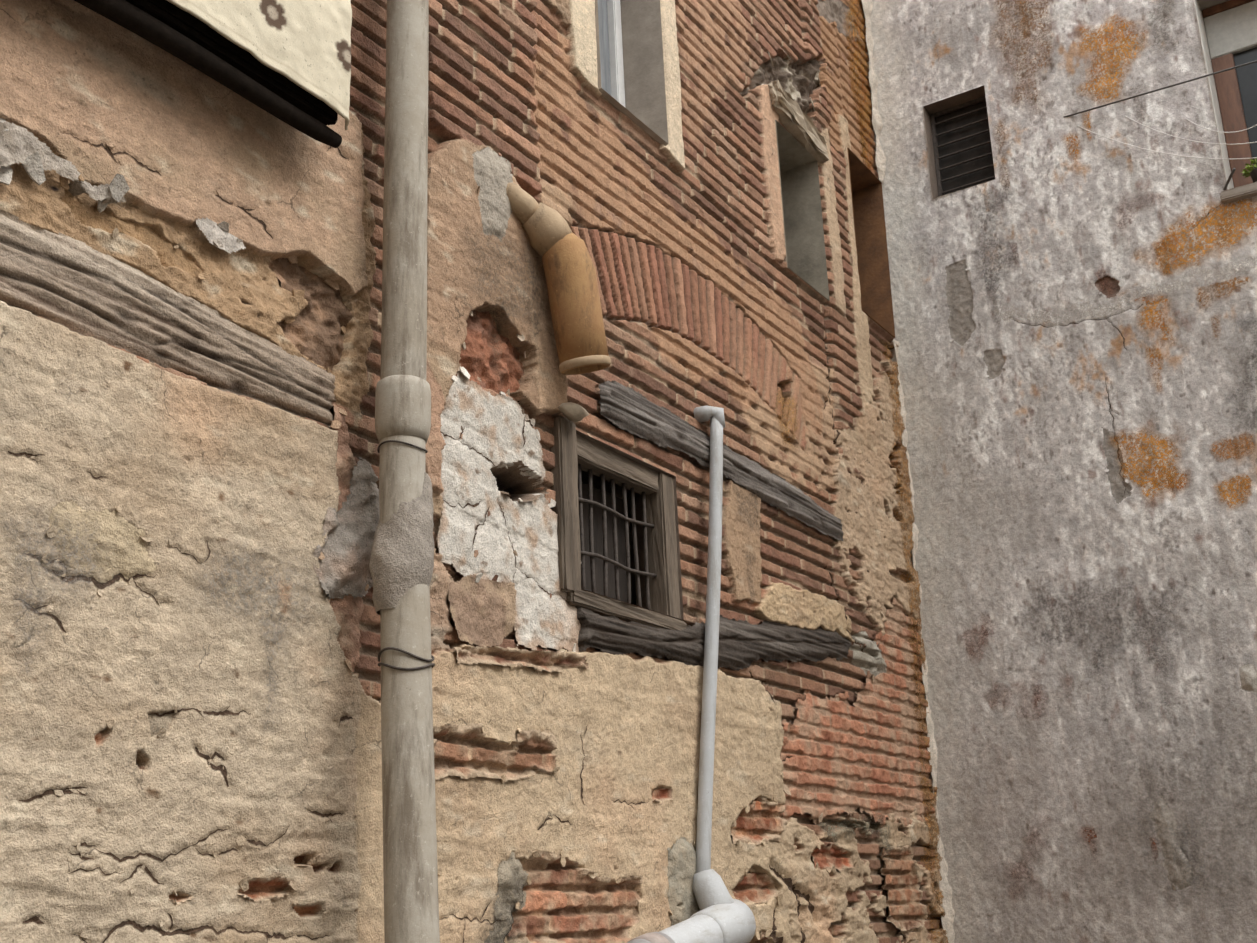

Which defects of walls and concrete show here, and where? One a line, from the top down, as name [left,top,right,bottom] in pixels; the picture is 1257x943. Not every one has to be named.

corrosion [1079,16,1148,102]
peeling [0,118,205,280]
corrosion [1137,199,1257,273]
peeling [437,310,590,672]
corrosion [1112,430,1188,498]
corrosion [1215,474,1251,508]
crack [148,707,251,717]
crack [19,786,86,802]
crack [195,747,229,787]
flaking render [433,723,560,784]
crack [60,810,343,943]
spalling [503,849,643,943]